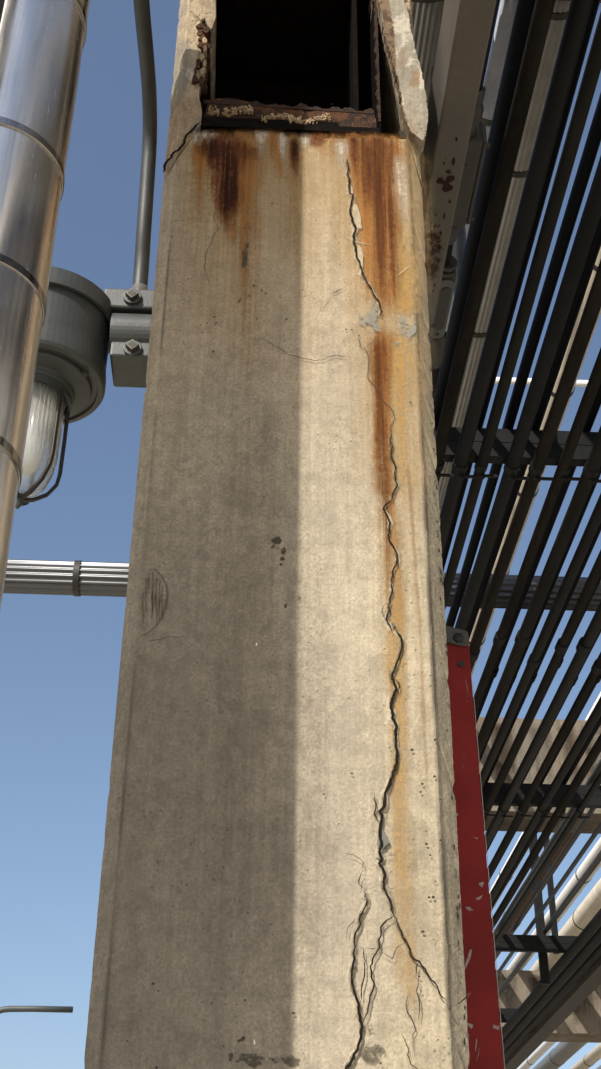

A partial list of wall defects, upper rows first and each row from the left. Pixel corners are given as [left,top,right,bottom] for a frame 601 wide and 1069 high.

crack [163,122,201,173]
spalling [192,0,414,142]
rust [192,133,455,314]
crack [260,158,469,1069]
rust [366,330,414,908]